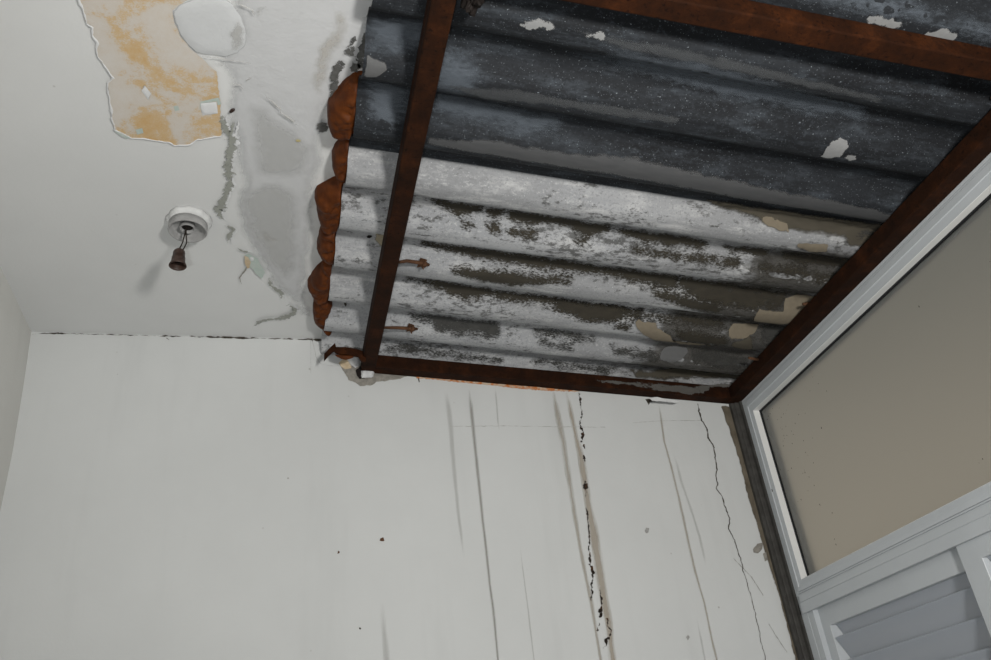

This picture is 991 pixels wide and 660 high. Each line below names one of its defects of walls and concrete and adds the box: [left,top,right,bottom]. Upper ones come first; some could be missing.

peeling [77,0,222,146]
crack [40,114,328,370]
mould [385,343,504,363]
corrosion [416,377,579,392]
mould [406,198,849,376]
leakage [471,408,498,658]
crack [466,393,612,646]
leakage [555,404,601,660]
crack [636,406,787,660]